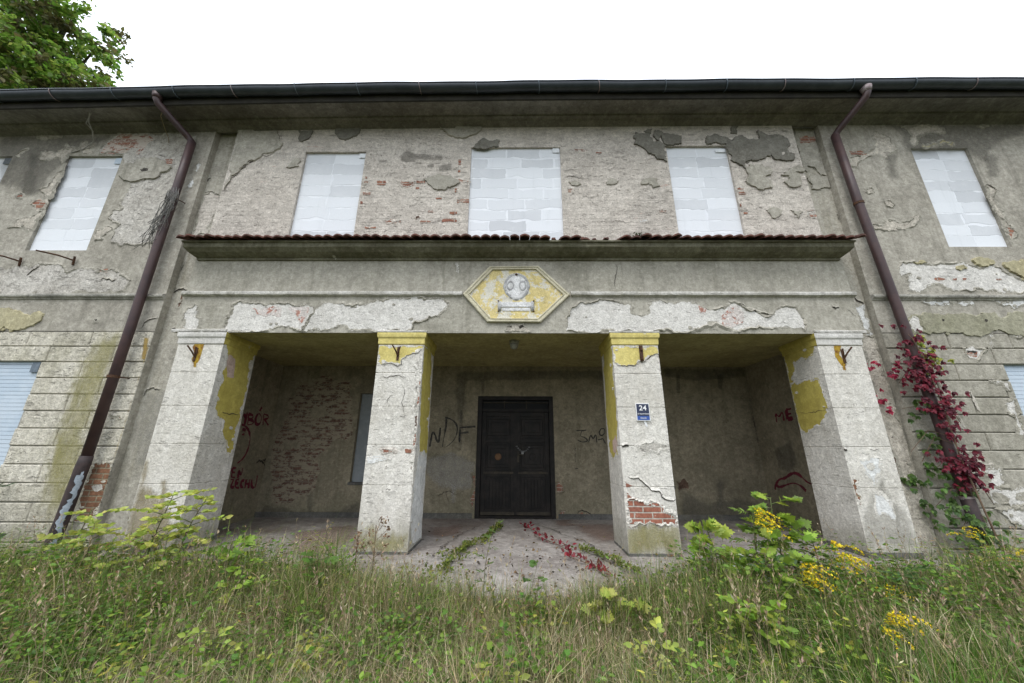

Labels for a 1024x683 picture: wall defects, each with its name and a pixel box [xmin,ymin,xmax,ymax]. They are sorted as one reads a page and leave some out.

spalling [6,132,227,247]
spalling [222,296,452,333]
spalling [565,297,807,333]
spalling [898,260,1024,335]
peeling [213,345,255,464]
peeling [784,346,829,436]
flaking render [47,460,114,556]
crack [628,474,675,501]
flaking render [625,482,679,530]